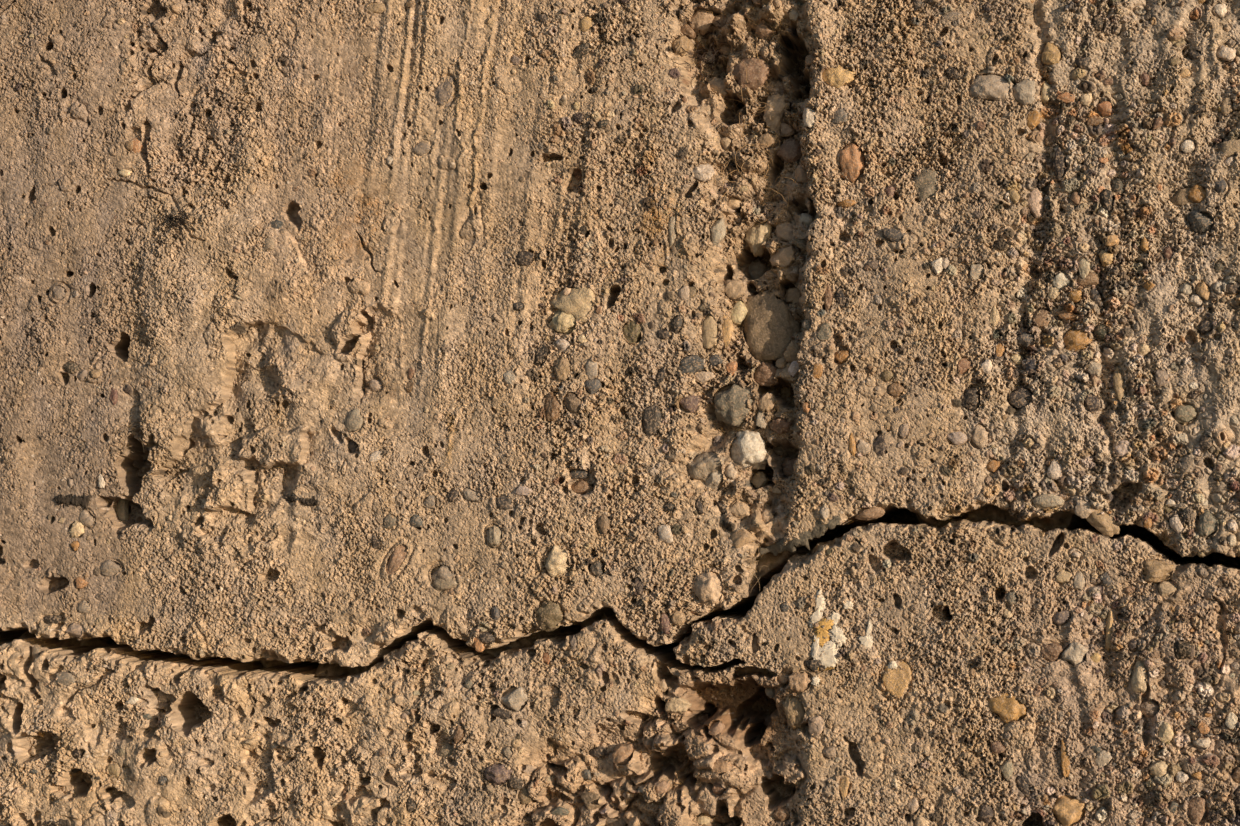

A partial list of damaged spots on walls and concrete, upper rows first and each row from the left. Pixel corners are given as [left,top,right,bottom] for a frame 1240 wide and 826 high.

crack [0,504,1240,707]
spalling [520,660,825,826]